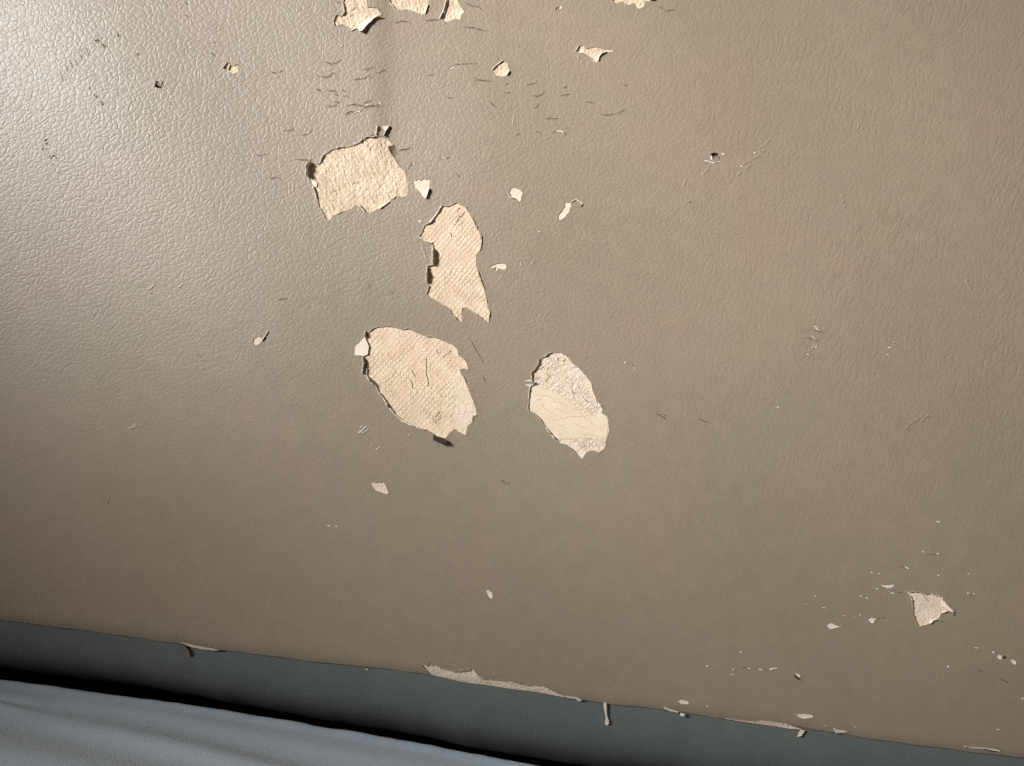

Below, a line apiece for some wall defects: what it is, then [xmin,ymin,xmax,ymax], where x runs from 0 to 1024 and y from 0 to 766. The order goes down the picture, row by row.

peeling [333,0,428,33]
peeling [439,0,464,22]
peeling [613,0,651,9]
peeling [492,60,510,77]
peeling [575,46,613,62]
peeling [305,126,430,220]
peeling [558,199,583,220]
peeling [418,203,506,322]
peeling [355,327,477,443]
peeling [525,352,609,458]
peeling [860,572,954,626]
peeling [422,663,564,697]